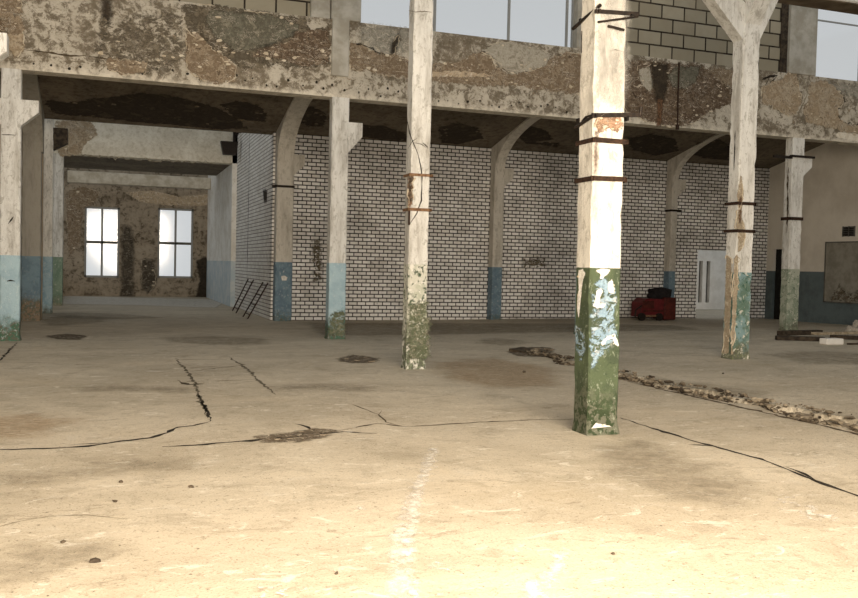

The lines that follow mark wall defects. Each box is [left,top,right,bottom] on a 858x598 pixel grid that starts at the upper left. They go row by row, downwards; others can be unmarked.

peeling [0,0,26,59]
peeling [95,4,332,85]
peeling [594,59,733,156]
peeling [693,138,730,160]
peeling [836,132,858,142]
peeling [574,269,619,368]
crack [0,357,399,450]
crack [421,418,565,426]
crack [621,418,858,496]
crack [628,381,858,435]